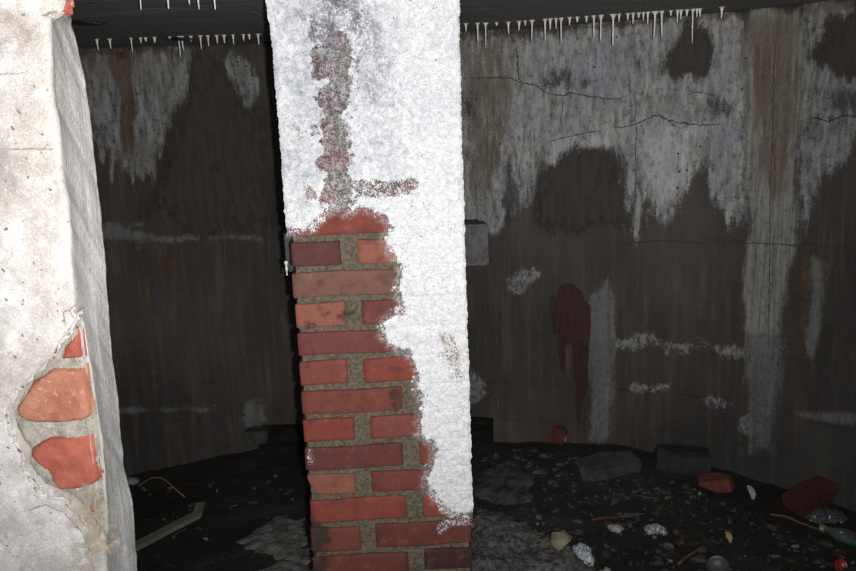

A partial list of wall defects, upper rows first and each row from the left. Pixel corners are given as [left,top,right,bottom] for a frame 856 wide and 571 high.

flaking render [5,307,105,528]
damp [80,45,284,243]
peeling [265,0,474,533]
crack [463,48,725,210]
damp [459,0,856,454]
crack [602,26,856,352]